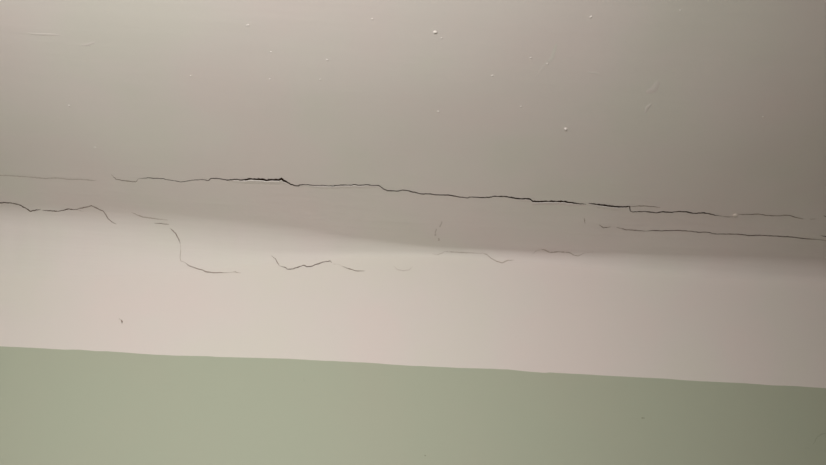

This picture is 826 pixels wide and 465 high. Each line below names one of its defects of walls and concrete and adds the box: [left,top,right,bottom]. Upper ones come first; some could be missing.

crack [0,202,113,223]
crack [115,178,826,241]
crack [134,213,239,273]
crack [272,256,357,271]